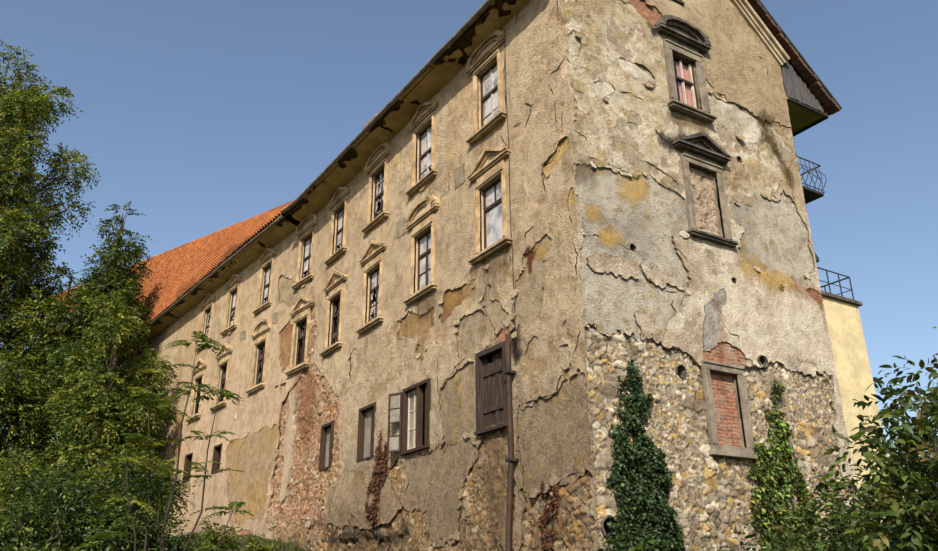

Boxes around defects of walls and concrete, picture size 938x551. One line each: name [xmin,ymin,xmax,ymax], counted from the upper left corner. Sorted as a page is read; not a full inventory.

crack [500,58,532,147]
crack [509,55,678,262]
peeling [543,0,823,343]
crack [524,211,647,355]
flaking render [225,302,359,541]
crack [524,374,563,404]
flaking render [702,342,748,369]